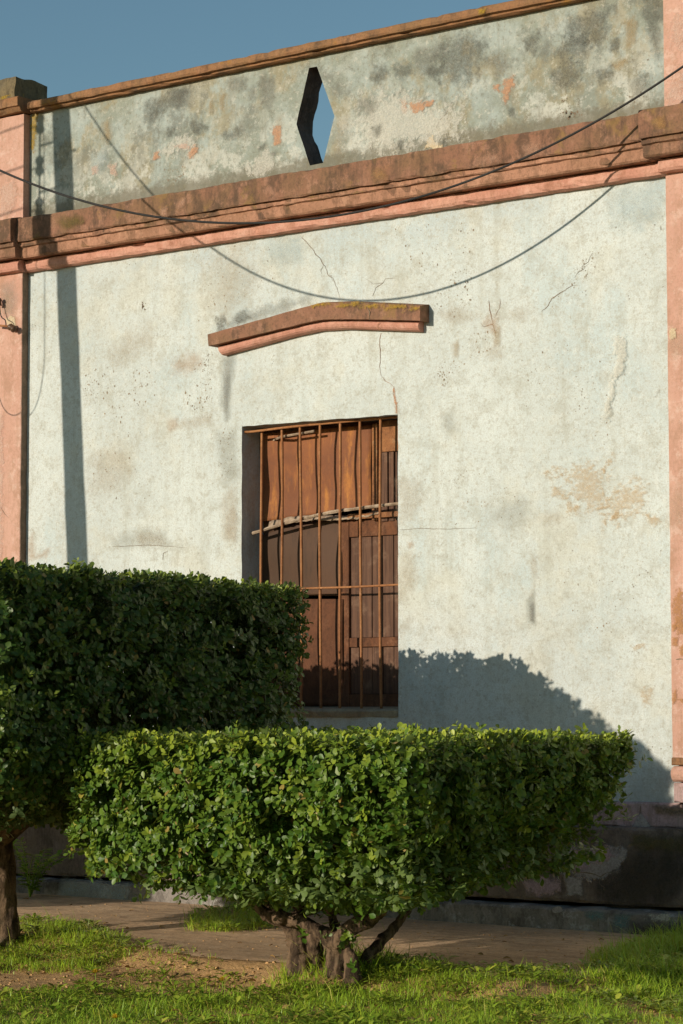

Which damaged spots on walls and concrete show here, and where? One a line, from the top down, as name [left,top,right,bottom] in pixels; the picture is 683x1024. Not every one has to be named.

crack [367,278,397,411]
rust [259,425,372,522]